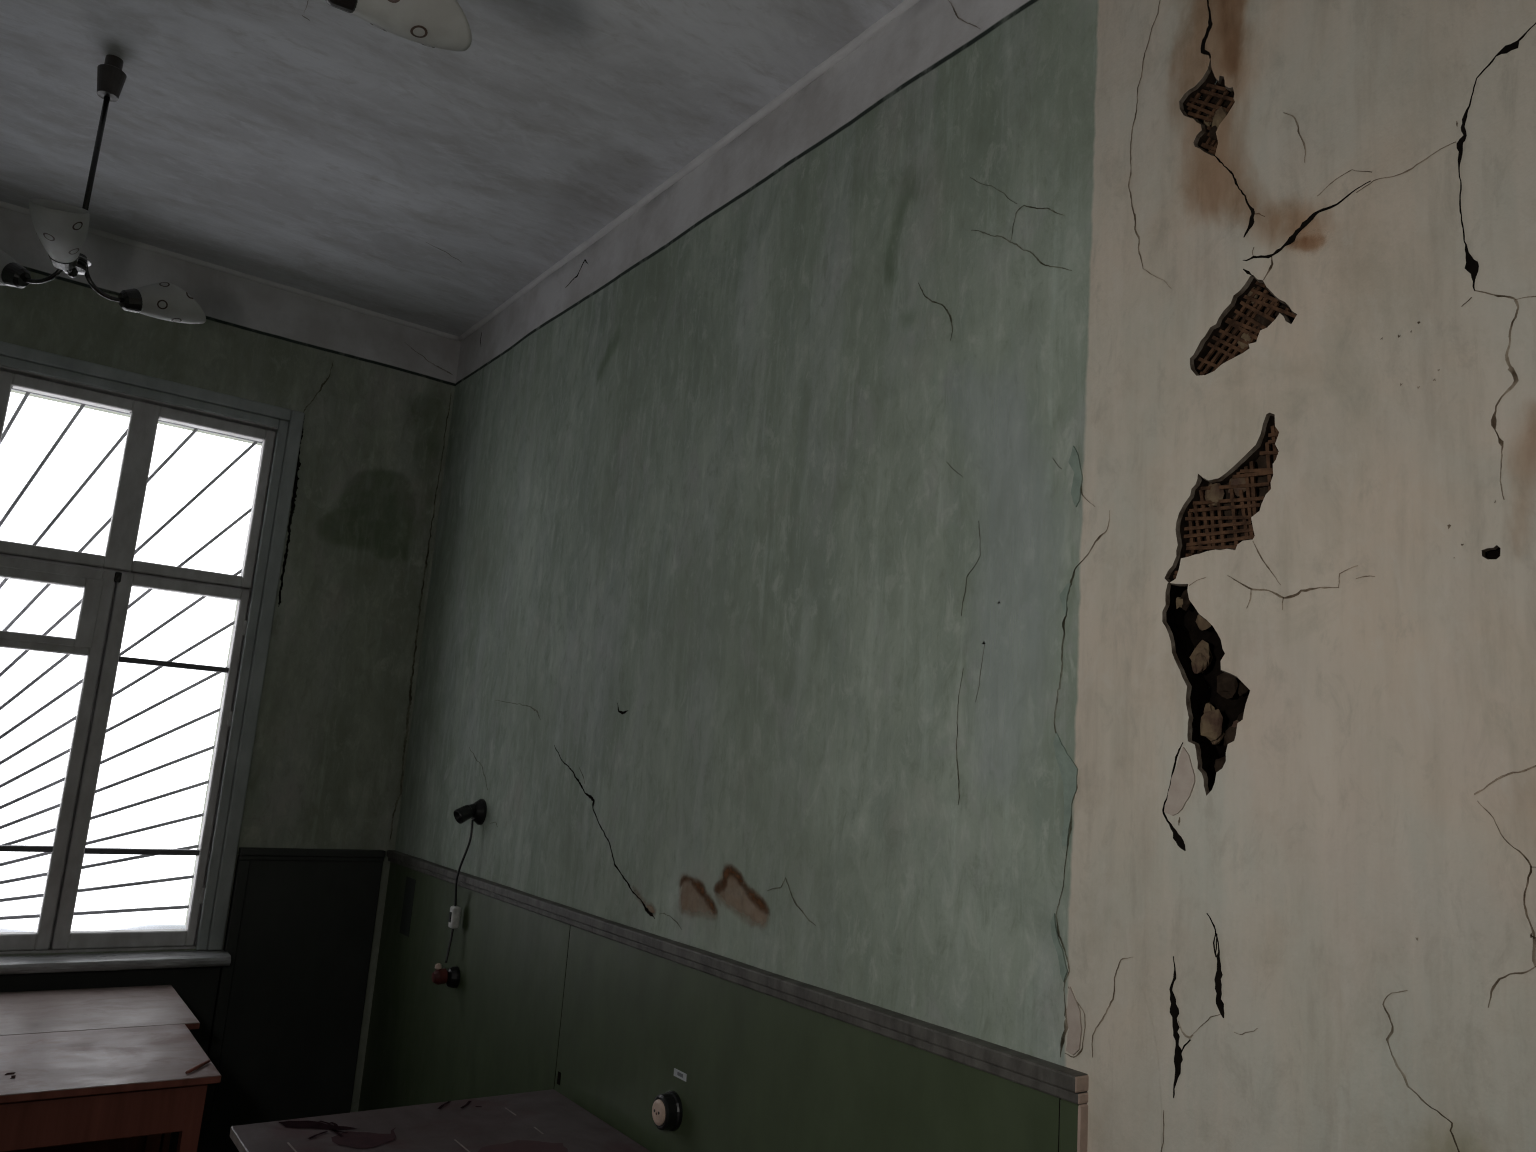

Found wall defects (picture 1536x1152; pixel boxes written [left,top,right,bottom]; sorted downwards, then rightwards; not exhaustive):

crack [1201,0,1213,59]
flaking render [1179,59,1235,156]
crack [1214,155,1408,280]
crack [1451,23,1536,327]
flaking render [1190,275,1297,376]
crack [1491,369,1518,469]
flaking render [1162,413,1279,816]
crack [554,745,682,930]
peeling [681,866,768,925]
crack [1162,742,1186,851]
crack [1486,810,1536,1008]
crack [1161,913,1255,1152]